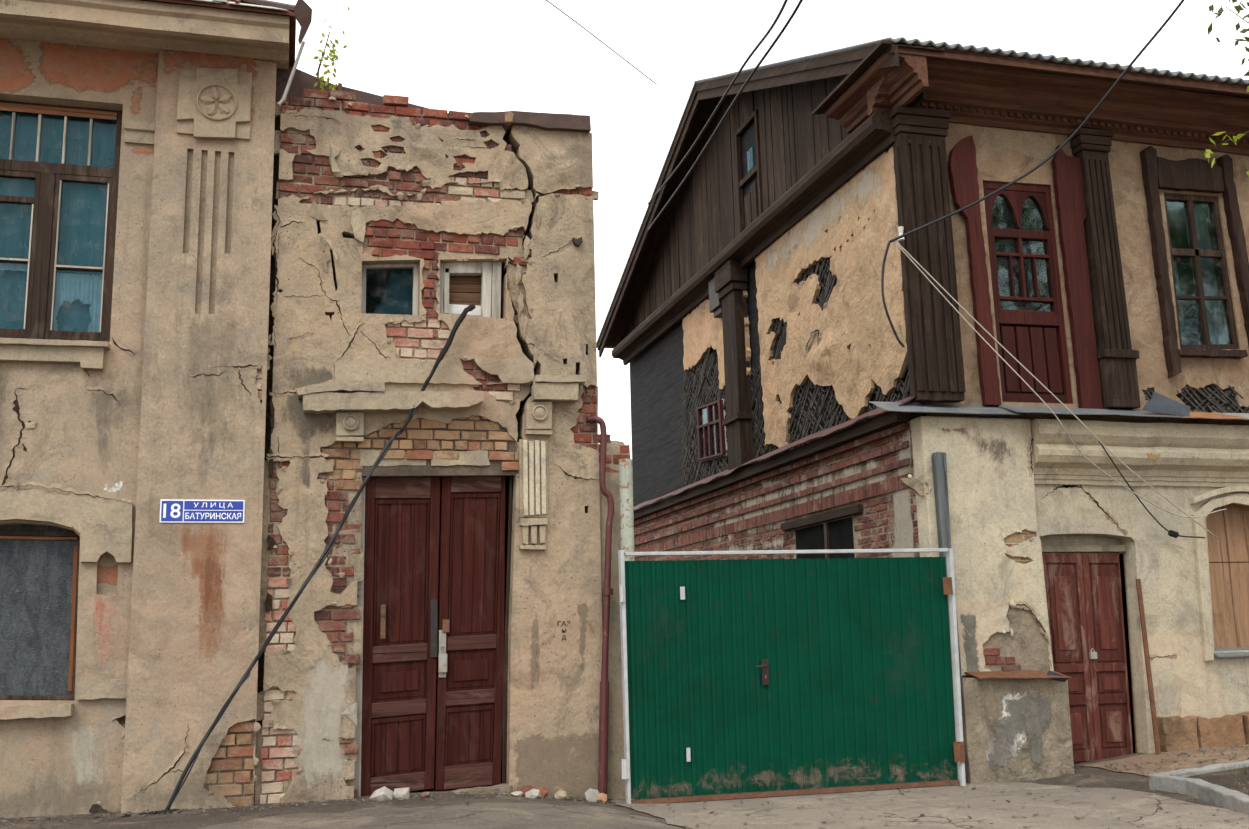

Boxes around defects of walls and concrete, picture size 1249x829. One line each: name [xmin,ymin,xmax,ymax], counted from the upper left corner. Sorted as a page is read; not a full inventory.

crack [0,388,132,503]
crack [194,110,387,478]
spalling [274,89,599,361]
spalling [461,356,531,405]
crack [501,185,573,442]
crack [265,593,273,612]
crack [267,535,277,550]
spalling [259,460,297,654]
spalling [314,414,522,668]
spalling [961,600,1050,672]
spalling [204,680,303,806]
crack [254,651,265,803]